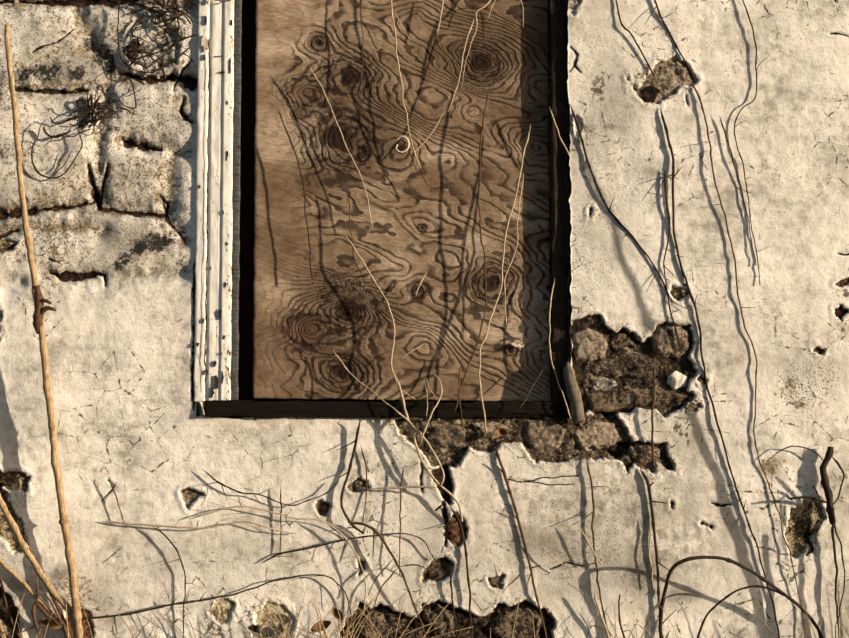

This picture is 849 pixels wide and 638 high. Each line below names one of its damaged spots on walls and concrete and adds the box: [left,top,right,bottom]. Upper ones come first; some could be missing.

flaking render [123,28,179,72]
flaking render [633,57,697,104]
flaking render [0,239,16,254]
flaking render [395,315,705,504]
flaking render [0,471,30,553]
flaking render [448,513,467,547]
flaking render [340,600,555,638]